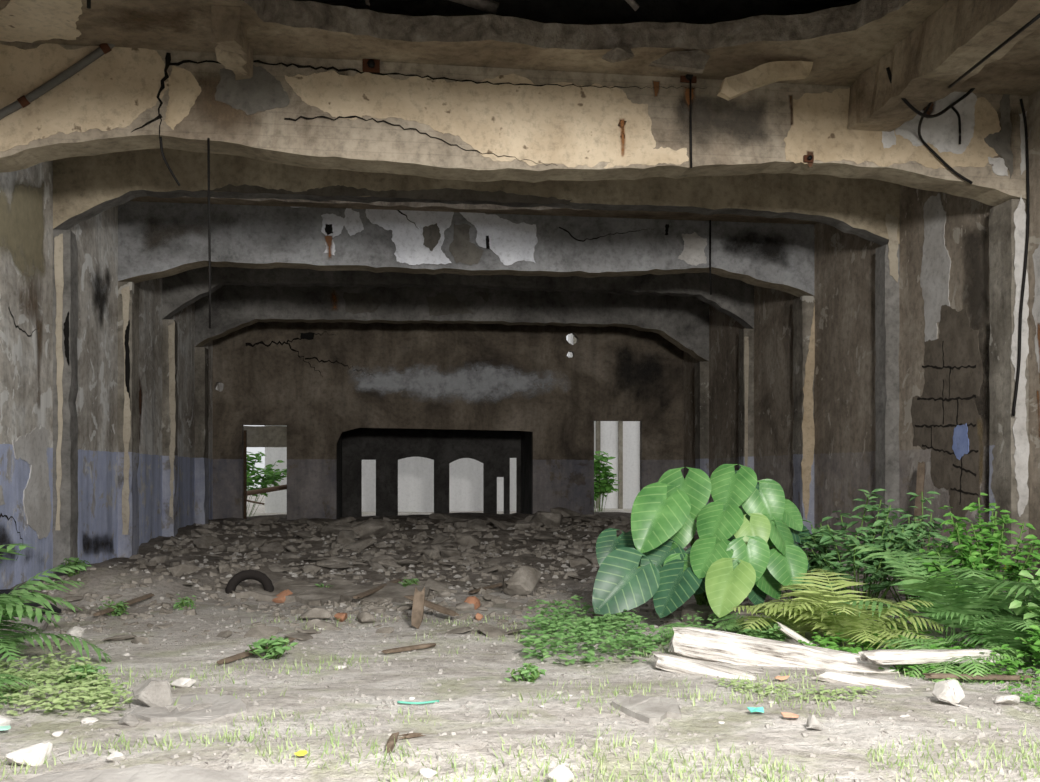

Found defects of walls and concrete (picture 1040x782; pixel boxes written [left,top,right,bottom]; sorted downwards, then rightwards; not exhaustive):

peeling [0,0,202,152]
crack [253,60,704,89]
spalling [717,61,813,101]
crack [284,116,553,166]
peeling [784,88,1027,178]
peeling [200,184,571,266]
water stain [726,230,786,264]
peeling [54,234,70,530]
peeling [121,286,131,535]
spalling [911,193,984,523]
peeling [1010,195,1040,517]